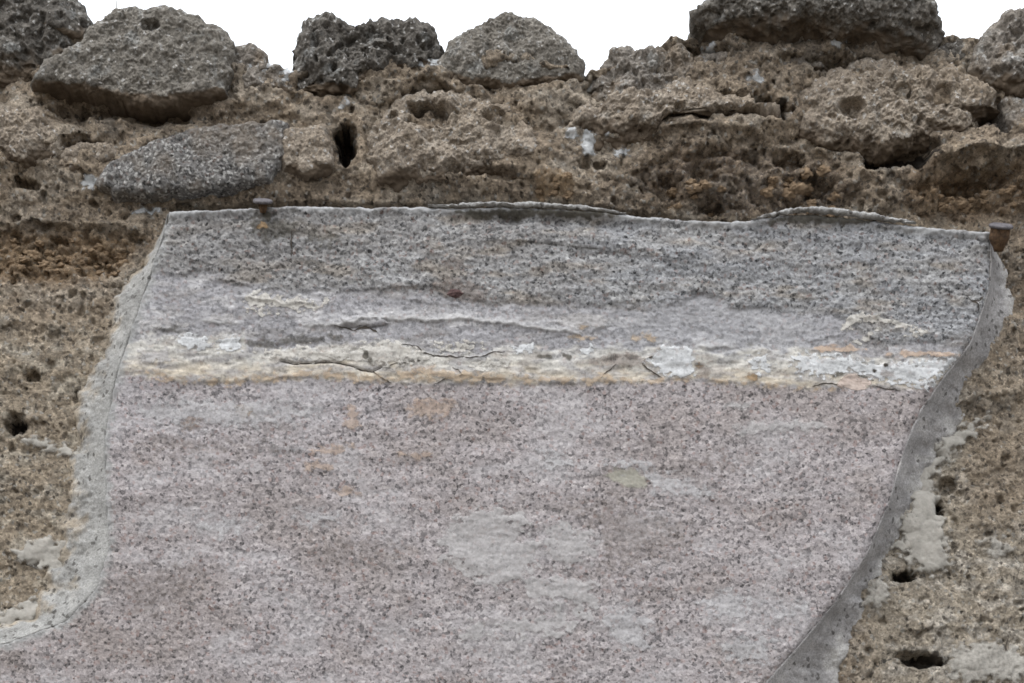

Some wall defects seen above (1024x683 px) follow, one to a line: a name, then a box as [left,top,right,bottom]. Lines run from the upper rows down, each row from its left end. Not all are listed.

crack [335,324,377,332]
crack [281,344,505,384]
flaking render [607,344,701,379]
flaking render [744,311,959,393]